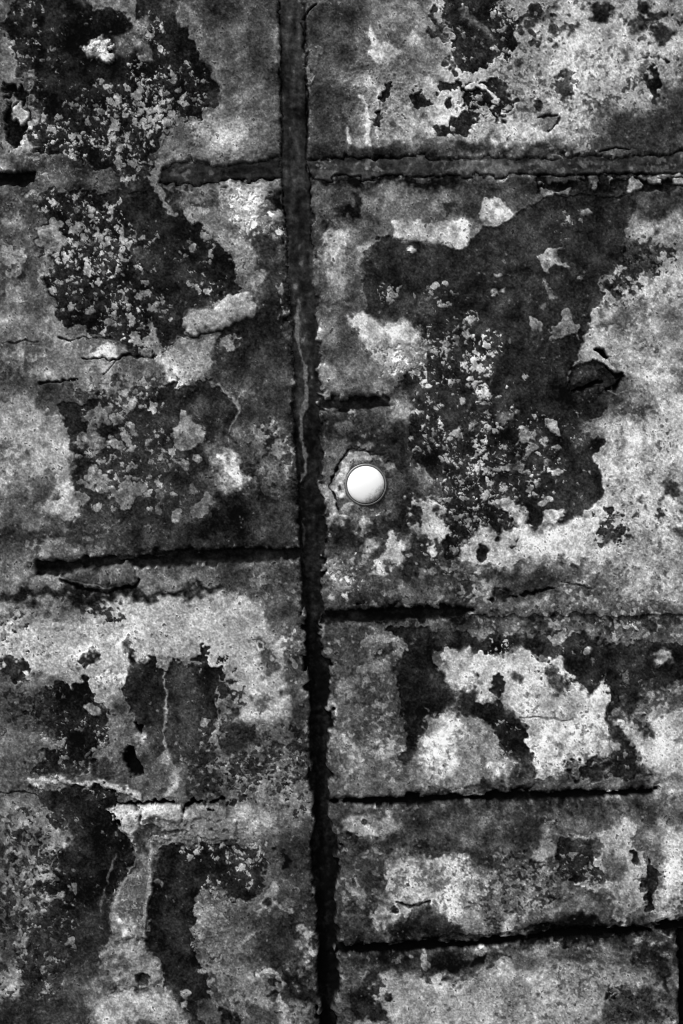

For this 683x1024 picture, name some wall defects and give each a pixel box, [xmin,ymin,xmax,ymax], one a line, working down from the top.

leakage [391,197,515,250]
efflorescence [346,311,431,383]
peeling [329,173,683,575]
leakage [403,495,452,558]
leakage [458,496,634,574]
leakage [406,645,683,793]
leakage [29,775,142,801]